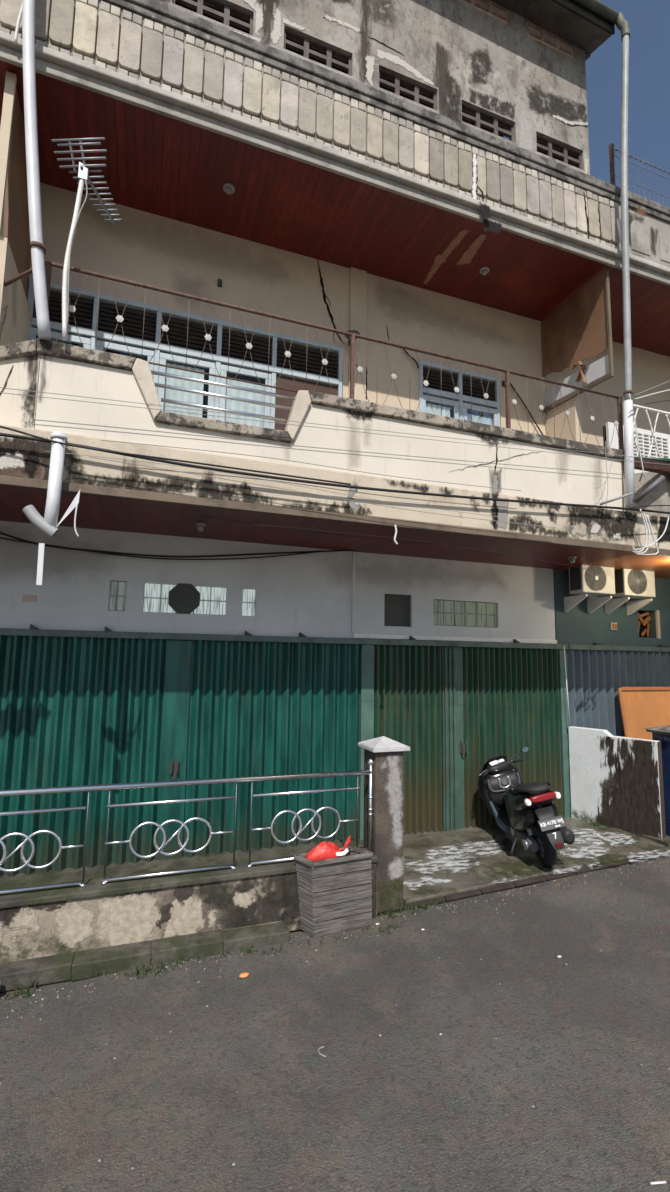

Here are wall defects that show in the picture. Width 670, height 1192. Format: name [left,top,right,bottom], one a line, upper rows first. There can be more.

damp [259,0,279,43]
damp [334,0,394,80]
damp [434,43,515,123]
damp [528,86,587,122]
crack [317,260,368,399]
damp [40,438,371,516]
damp [391,481,451,495]
crack [454,434,540,529]
damp [509,496,568,538]
damp [550,736,670,875]
peeling [0,892,221,953]
peeling [232,891,256,908]